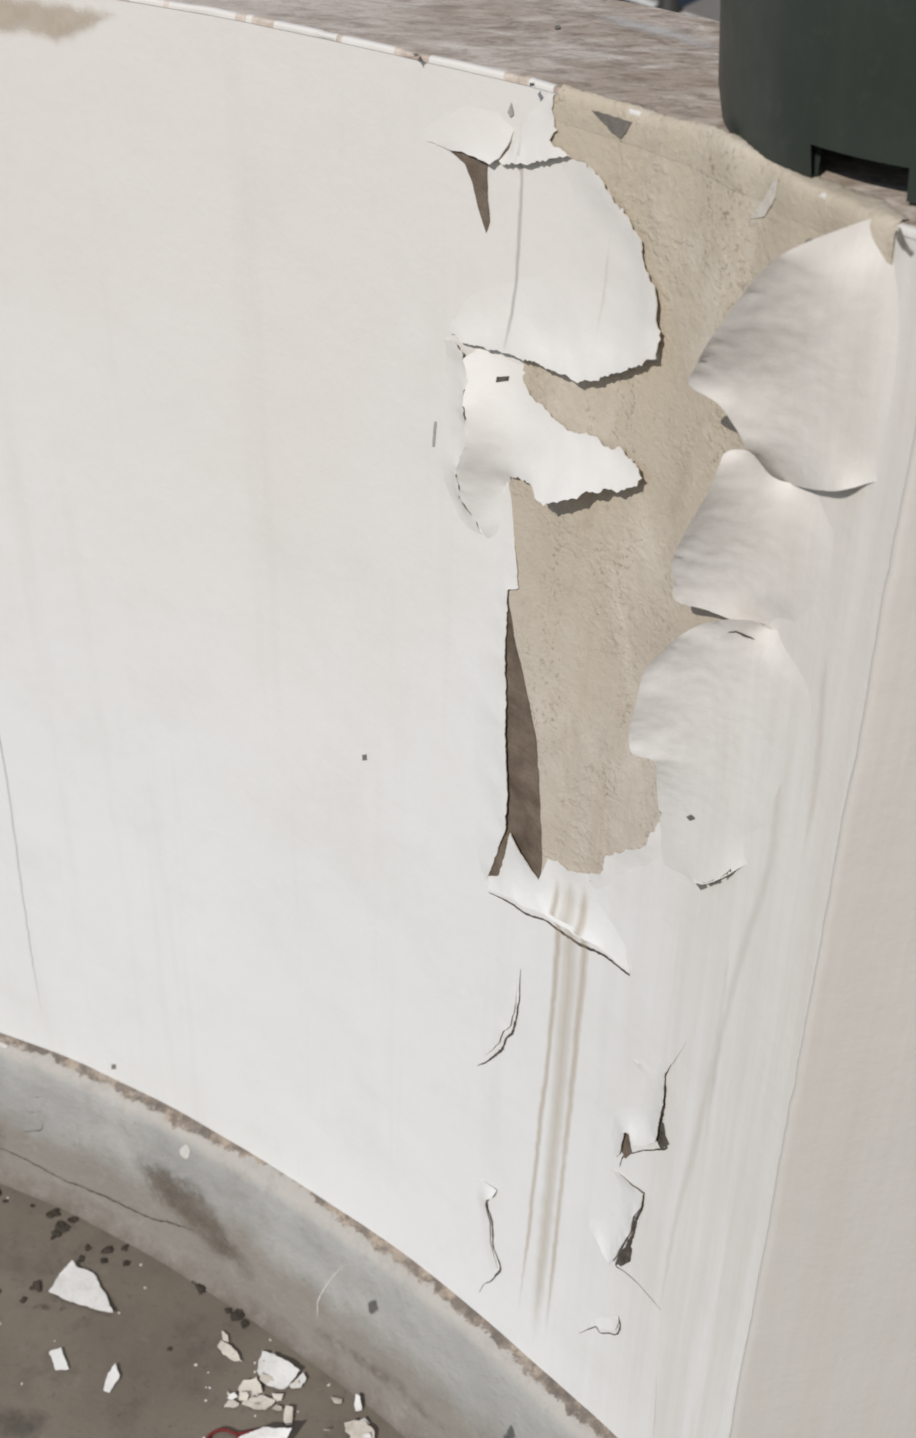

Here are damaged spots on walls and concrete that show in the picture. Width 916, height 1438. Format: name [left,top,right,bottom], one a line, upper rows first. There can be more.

leakage [0,0,97,37]
peeling [442,84,914,890]
crack [476,1179,501,1292]